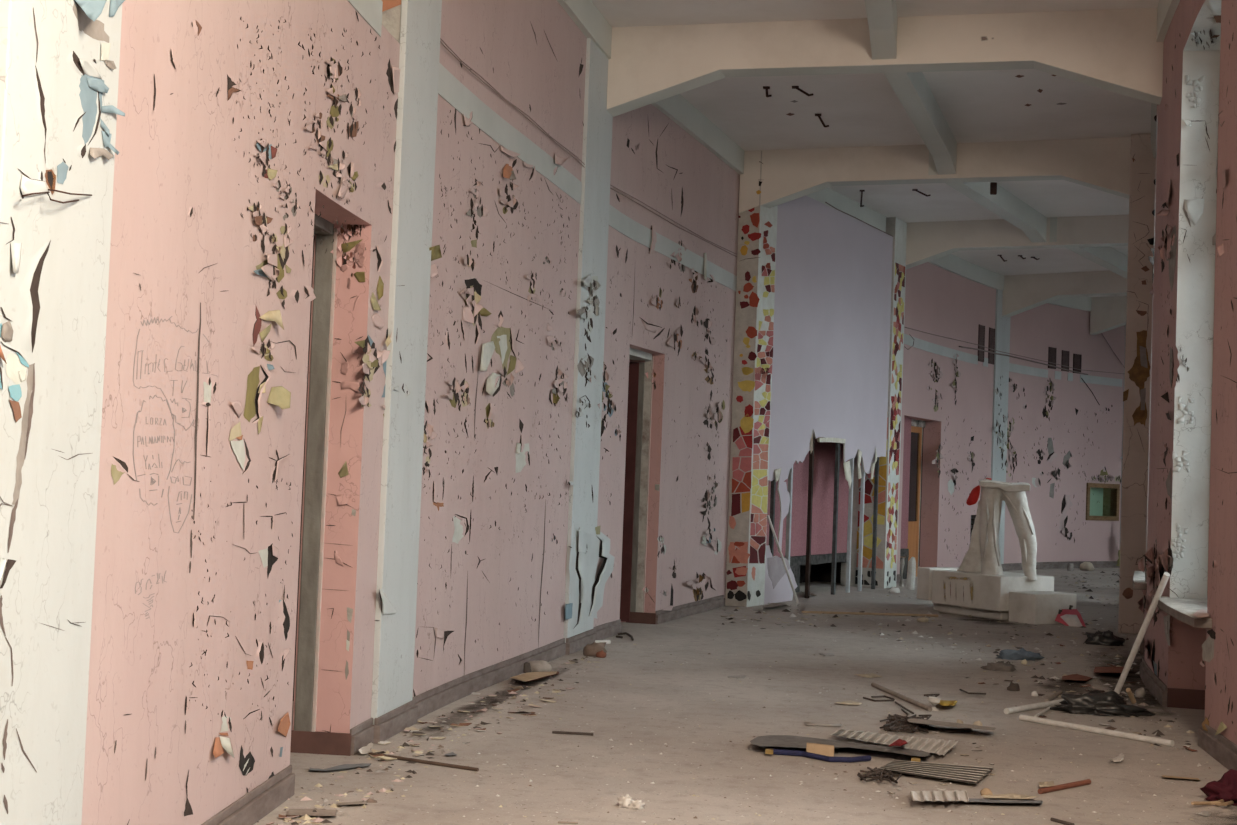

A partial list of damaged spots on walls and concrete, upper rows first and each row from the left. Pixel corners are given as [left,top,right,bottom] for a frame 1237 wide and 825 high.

peeling [1141,153,1179,291]
crack [1128,32,1237,331]
peeling [0,307,30,422]
peeling [229,139,300,473]
peeling [331,224,392,416]
peeling [422,146,525,477]
peeling [927,354,961,412]
peeling [993,377,1027,479]
peeling [1032,438,1075,543]
peeling [1157,443,1190,510]
crack [1223,296,1237,385]
peeling [565,525,617,631]